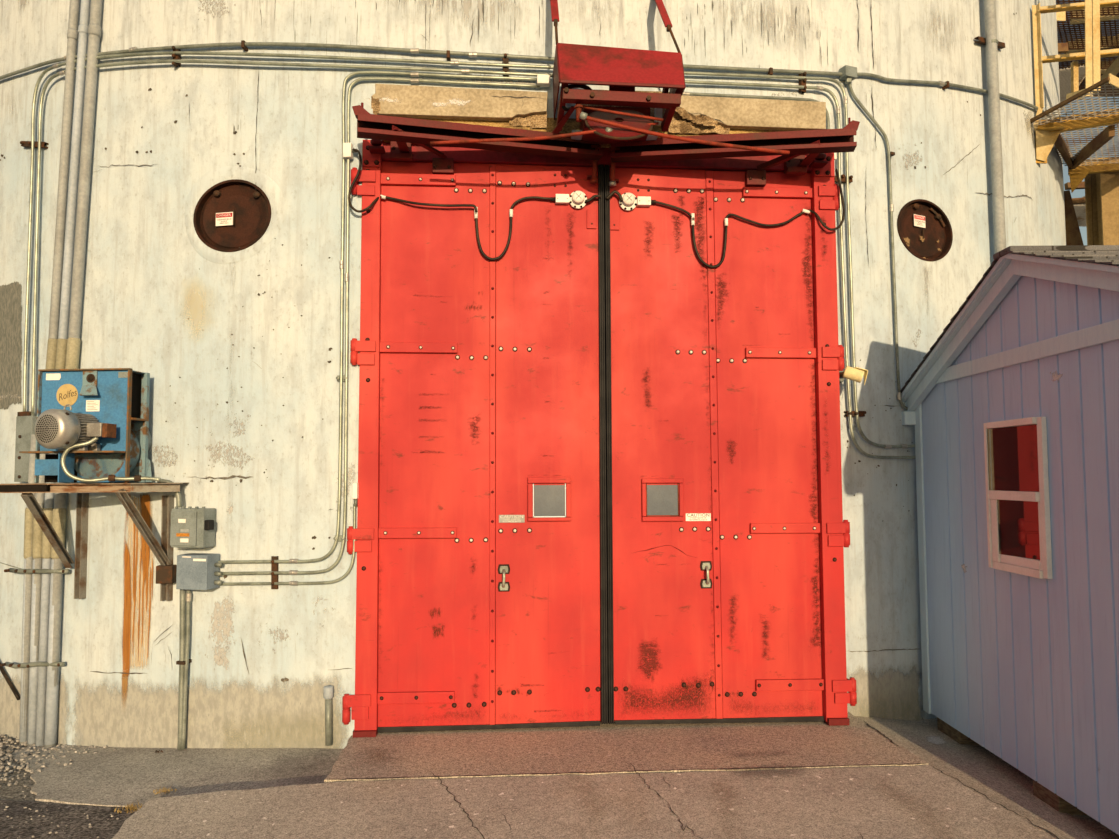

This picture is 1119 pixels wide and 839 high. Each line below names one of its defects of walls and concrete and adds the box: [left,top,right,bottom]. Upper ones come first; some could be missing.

spalling [669,107,730,134]
crack [946,144,1043,222]
peeling [0,282,22,409]
corrosion [122,494,153,697]
corrosion [640,642,659,678]
corrosion [626,681,713,710]
crack [329,721,1059,839]